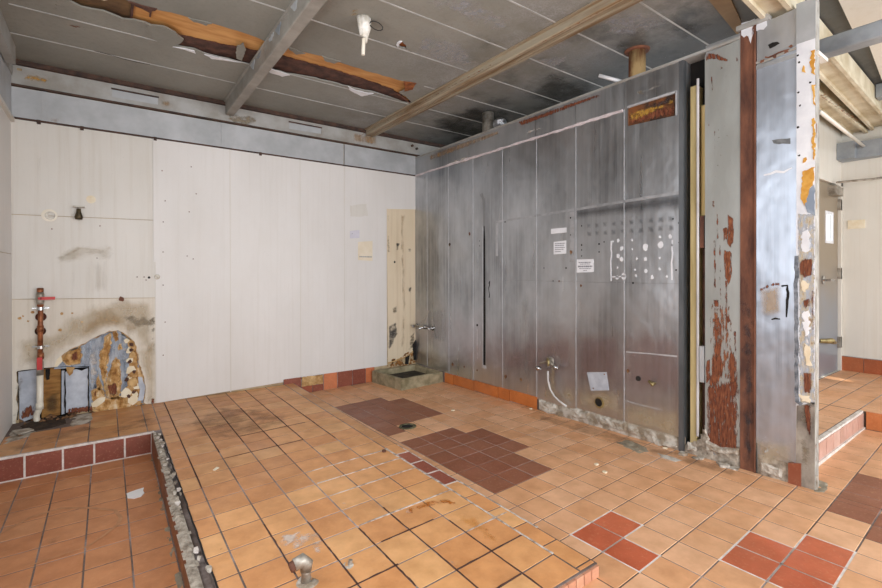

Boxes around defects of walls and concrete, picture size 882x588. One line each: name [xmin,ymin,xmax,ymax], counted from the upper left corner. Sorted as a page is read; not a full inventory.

peeling [128,1,157,13]
peeling [173,0,298,69]
corrosion [519,95,598,125]
leakage [542,82,583,103]
corrosion [630,101,674,124]
peeling [796,50,816,105]
corrosion [706,201,752,451]
peeling [793,118,816,490]
leakage [60,332,130,402]
peeling [121,338,145,406]
spalling [529,399,740,471]